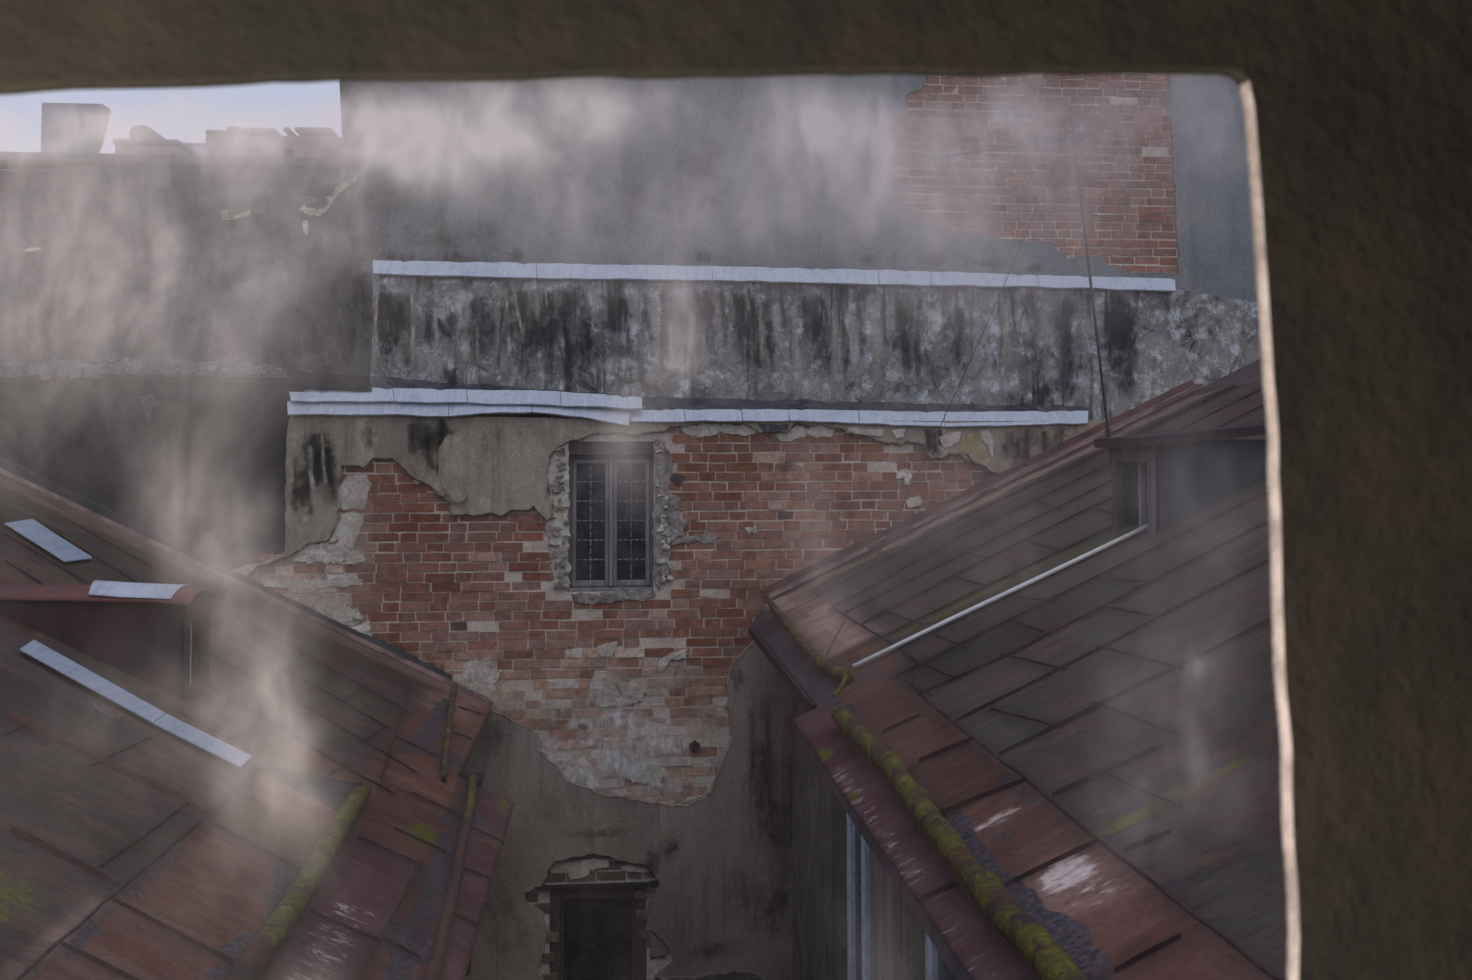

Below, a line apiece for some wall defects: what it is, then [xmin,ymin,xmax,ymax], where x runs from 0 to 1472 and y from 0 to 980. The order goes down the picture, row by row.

spalling [900,74,1181,274]
damp [360,273,979,373]
damp [292,434,335,514]
damp [409,419,447,464]
spalling [244,422,995,807]
spalling [524,854,766,980]